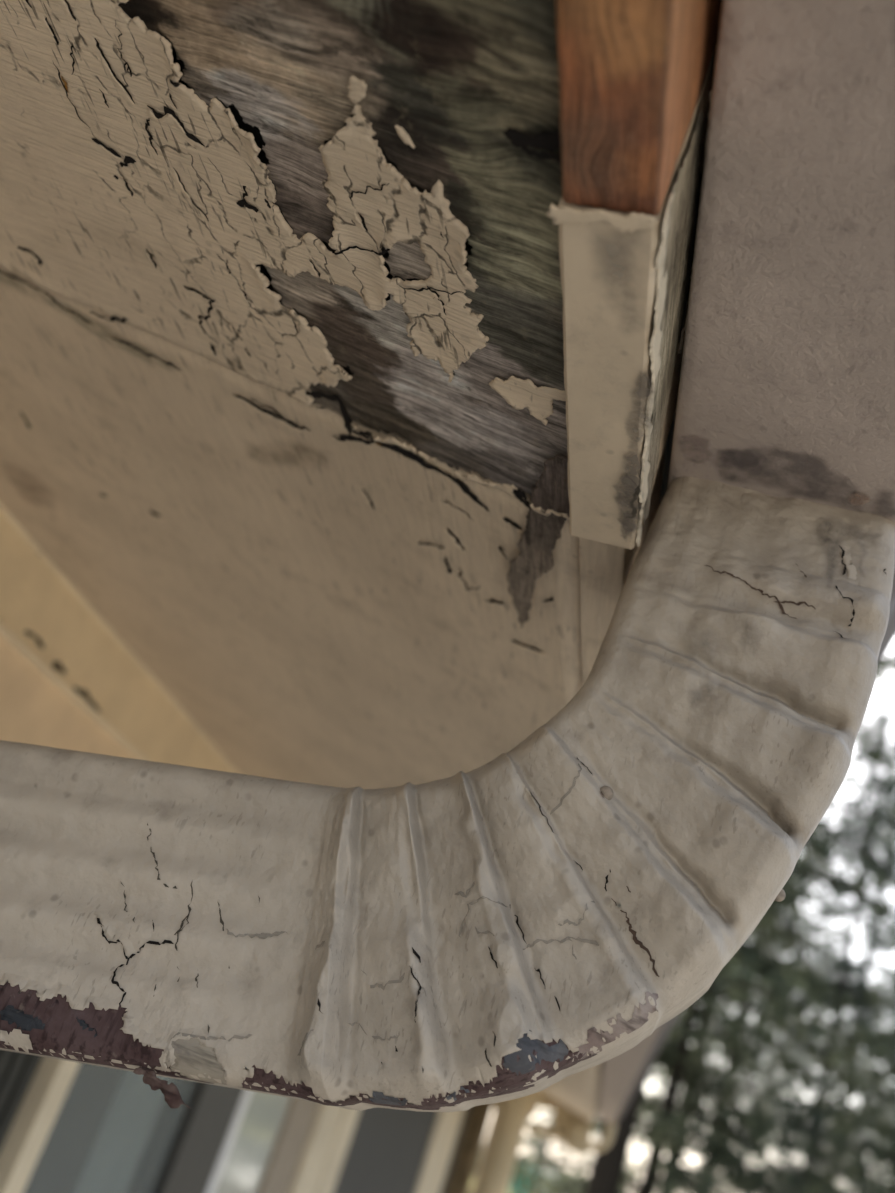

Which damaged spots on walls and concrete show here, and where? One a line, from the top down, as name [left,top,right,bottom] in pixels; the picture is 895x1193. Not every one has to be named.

crack [19,0,209,222]
crack [237,186,271,222]
crack [0,244,181,371]
crack [183,256,259,357]
peeling [111,0,713,547]
damp [726,451,830,499]
crack [418,501,503,604]
crack [705,564,815,619]
crack [834,545,886,639]
crack [94,823,288,1006]
crack [455,861,660,1010]
peeling [0,972,659,1110]